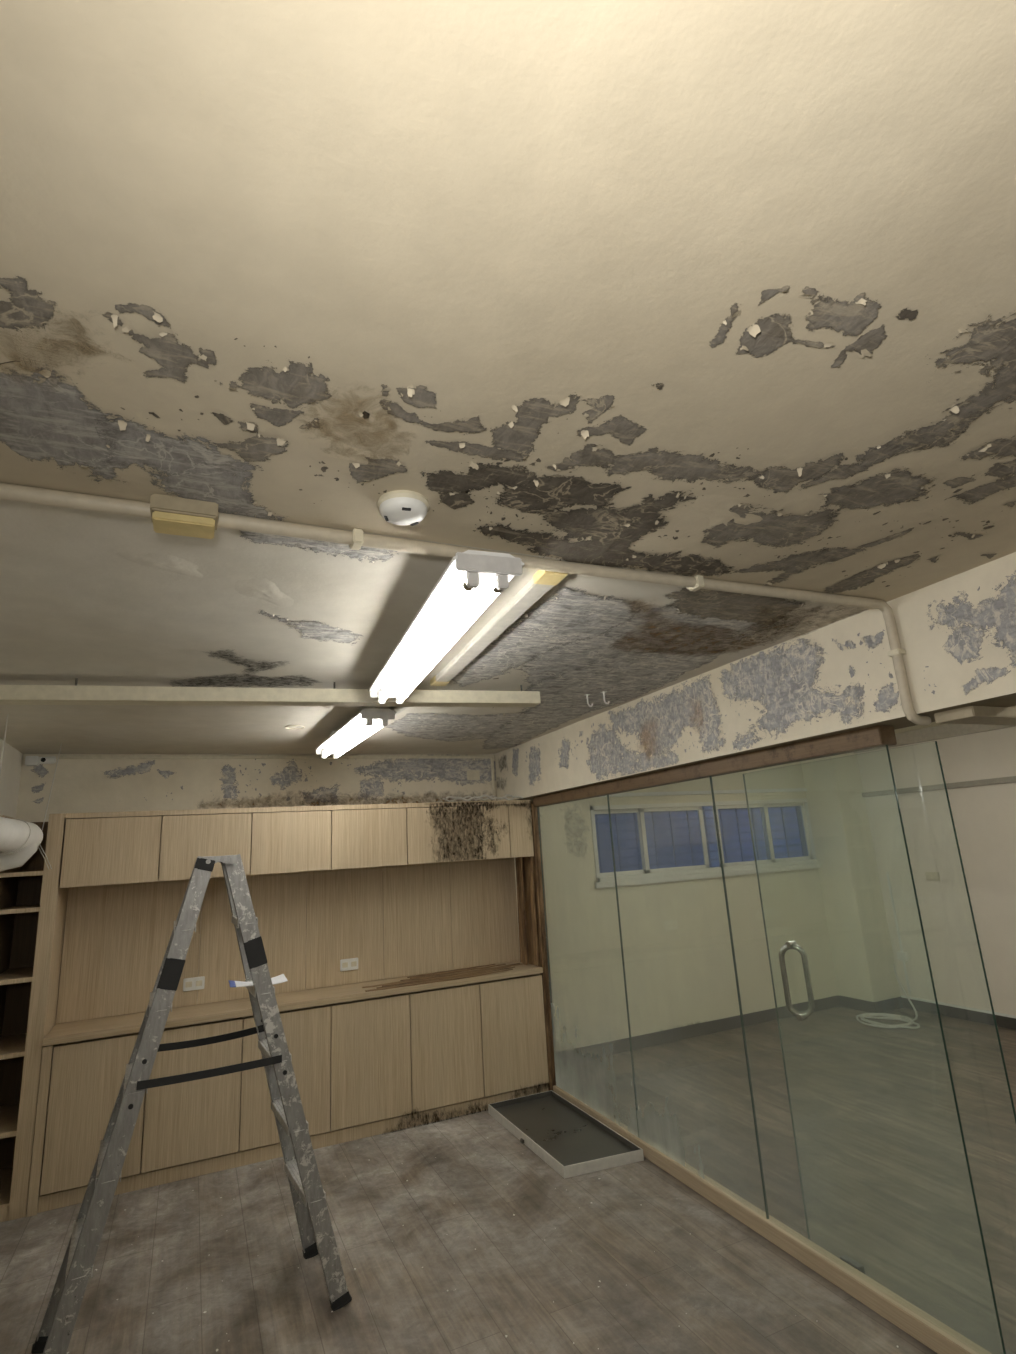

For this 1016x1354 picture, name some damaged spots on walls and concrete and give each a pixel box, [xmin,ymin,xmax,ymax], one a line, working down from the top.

peeling [0,275,58,334]
peeling [709,285,918,368]
peeling [0,303,399,563]
peeling [309,310,1016,800]
peeling [259,609,362,645]
peeling [102,760,183,800]
peeling [213,759,340,805]
damp [202,757,541,861]